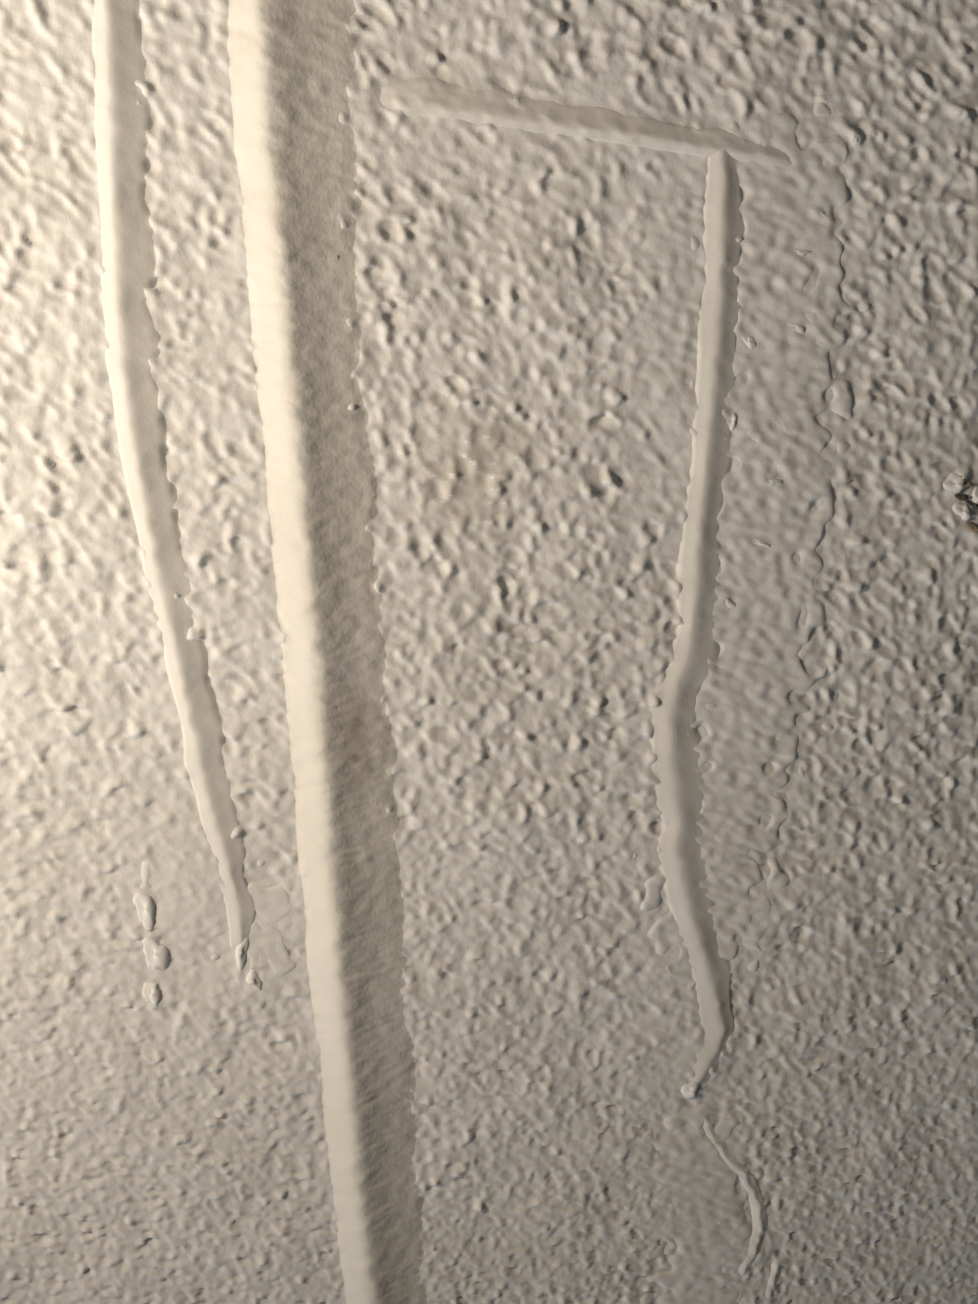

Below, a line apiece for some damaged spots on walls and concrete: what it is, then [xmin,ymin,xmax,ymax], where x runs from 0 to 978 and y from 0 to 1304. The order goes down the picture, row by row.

crack [92,0,262,990]
crack [380,77,792,1304]